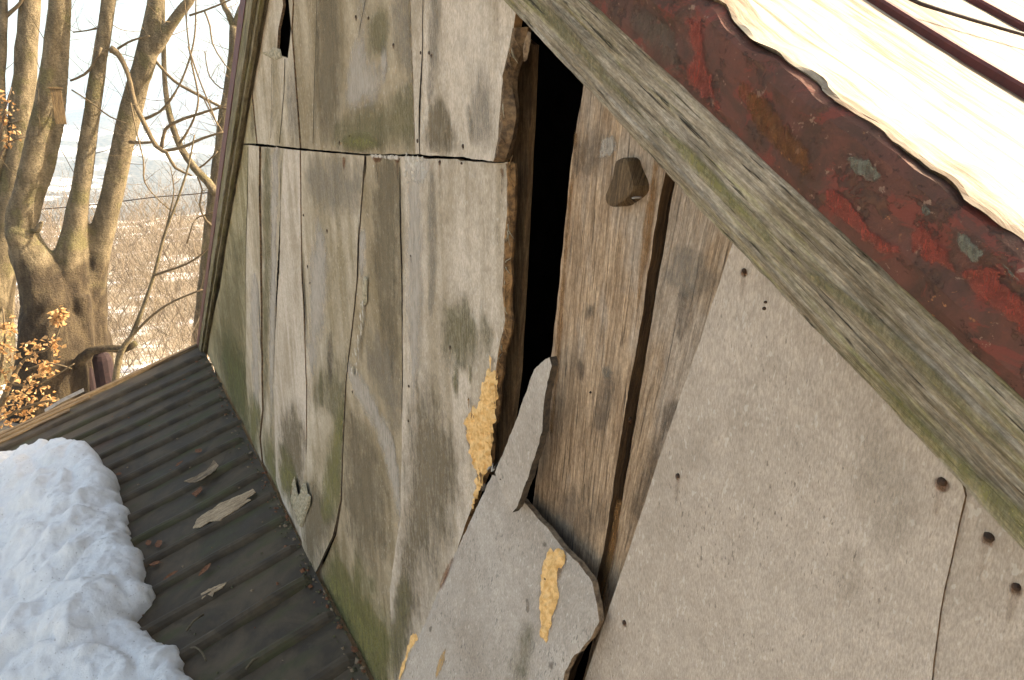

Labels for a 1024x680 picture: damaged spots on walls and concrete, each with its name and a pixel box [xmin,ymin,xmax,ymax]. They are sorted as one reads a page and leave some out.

damp [309,0,452,415]
damp [444,299,490,393]
damp [280,407,306,493]
damp [314,343,386,563]
peeling [399,633,418,680]
damp [391,387,458,668]
peeling [463,355,498,509]
peeling [526,548,566,642]